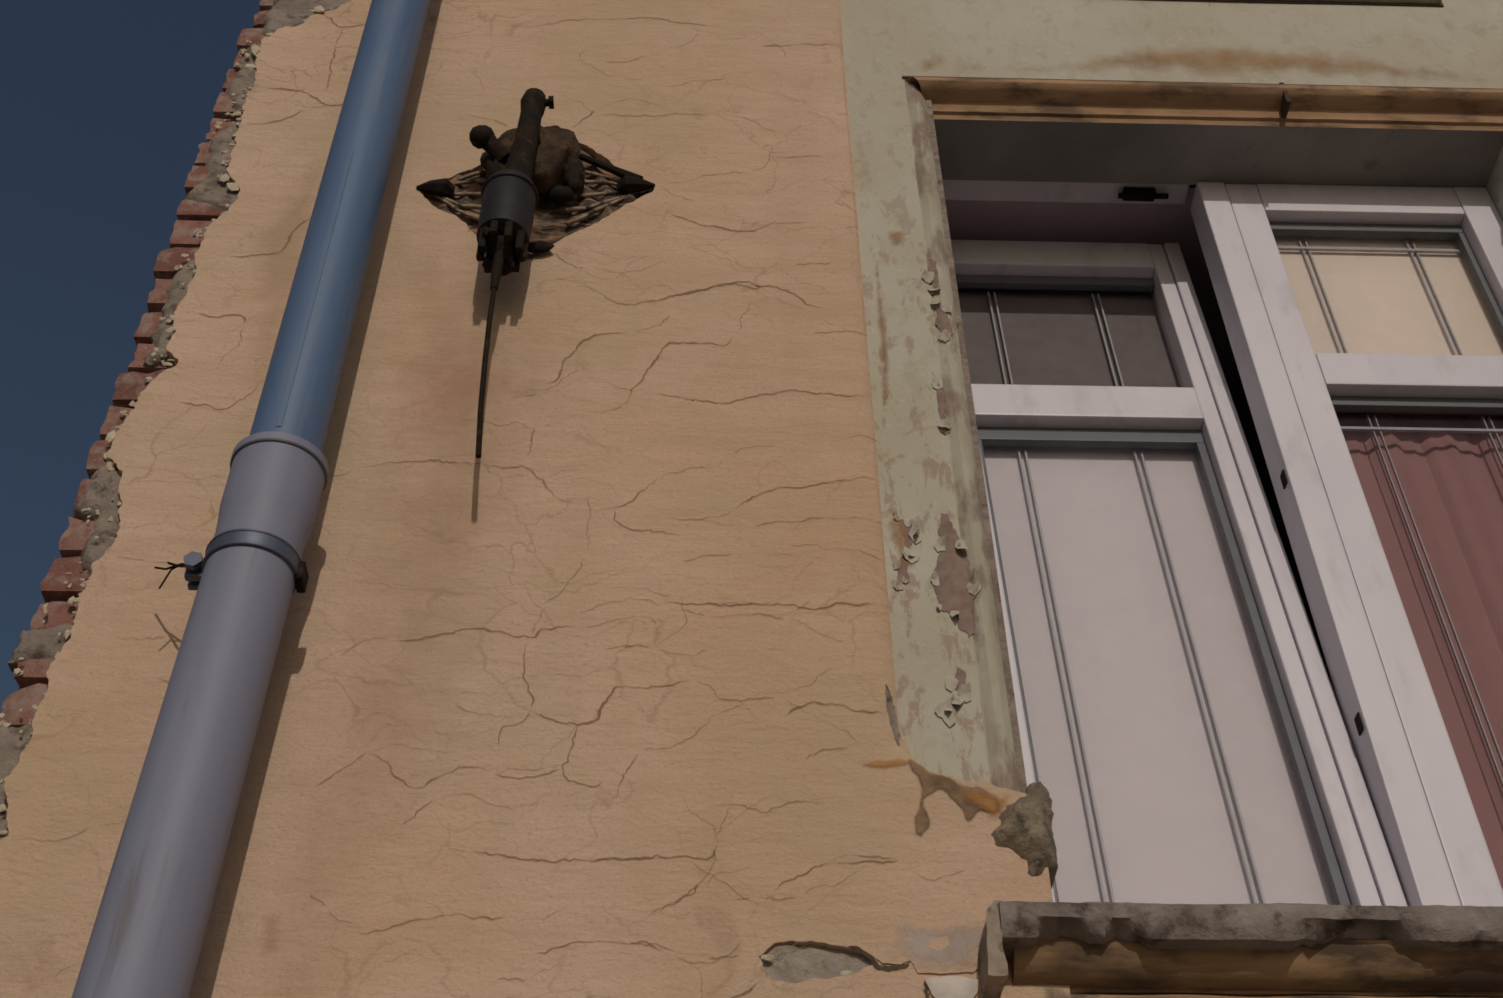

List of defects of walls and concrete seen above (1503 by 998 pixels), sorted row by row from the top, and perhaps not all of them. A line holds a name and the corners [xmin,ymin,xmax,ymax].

spalling [184,0,350,211]
spalling [143,260,196,368]
crack [670,281,812,306]
crack [695,389,851,404]
spalling [64,466,122,588]
crack [677,602,864,610]
peeling [893,508,981,638]
crack [406,626,680,787]
spalling [0,713,33,840]
spalling [885,686,1058,890]
crack [488,853,576,863]
crack [617,851,715,860]